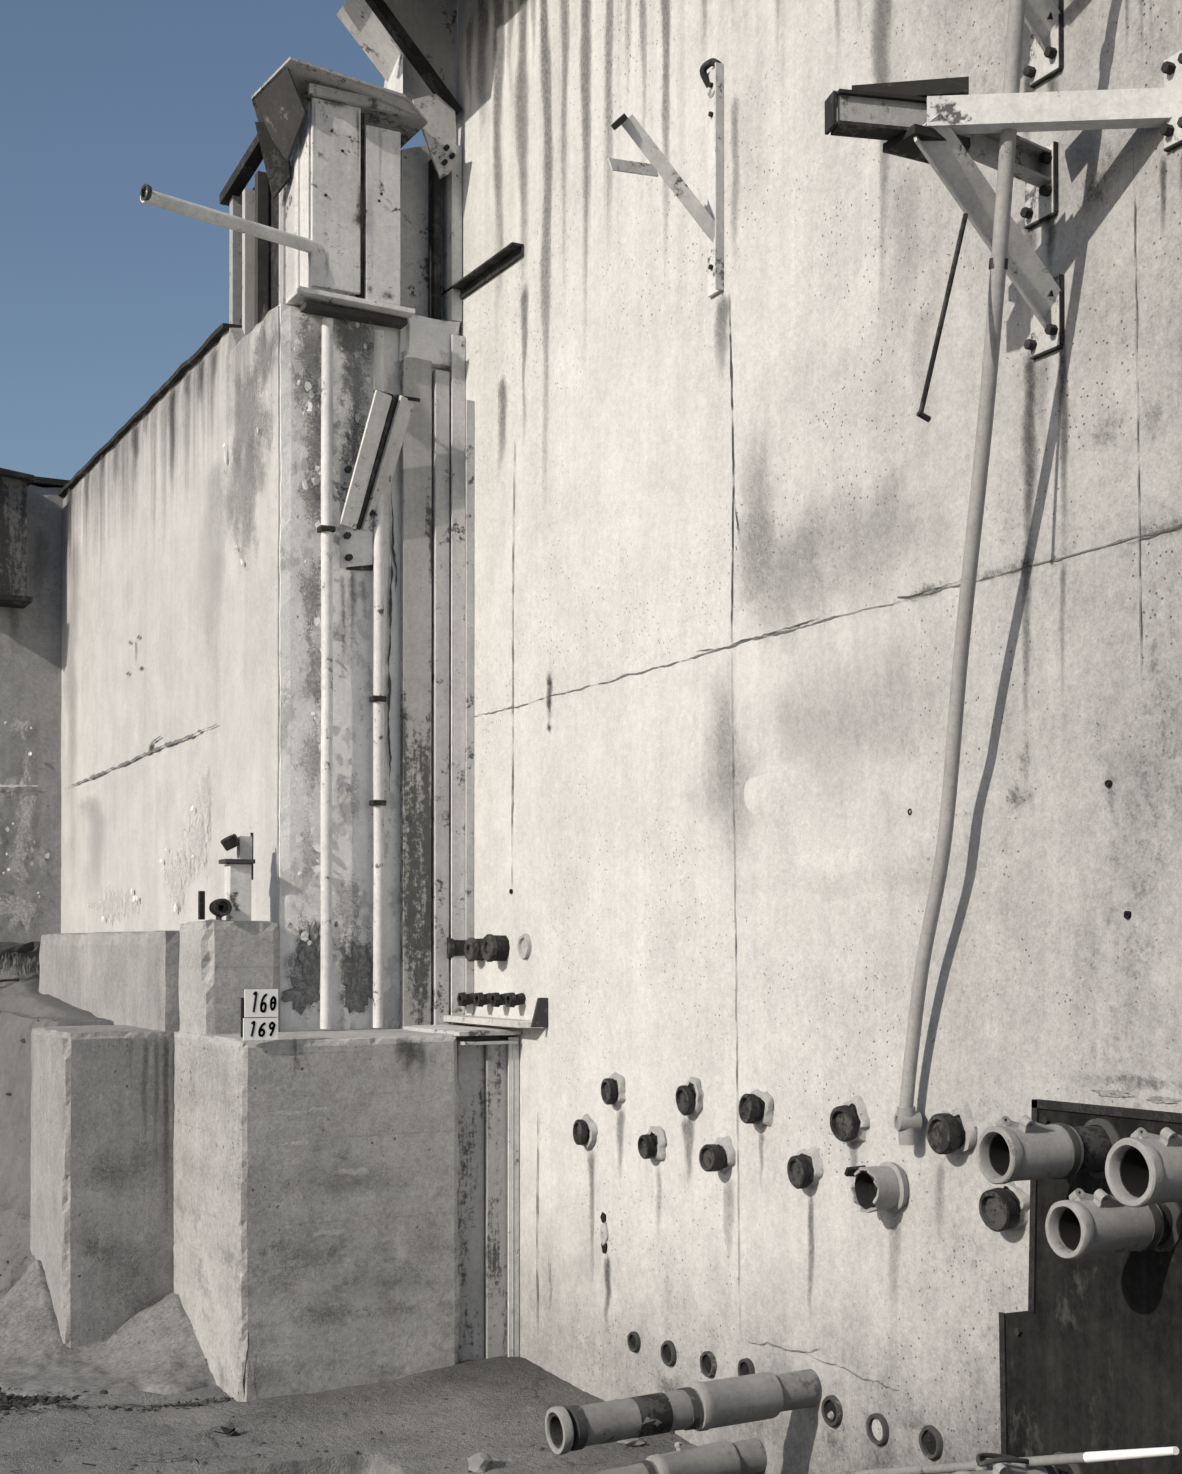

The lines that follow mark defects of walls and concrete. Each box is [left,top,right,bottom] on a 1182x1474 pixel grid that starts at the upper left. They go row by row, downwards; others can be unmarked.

damp [661,0,669,144]
damp [873,0,889,83]
damp [468,0,612,362]
damp [716,299,727,344]
crack [477,158,1182,885]
crack [0,724,216,788]
crack [731,864,739,1090]
crack [734,1232,742,1294]